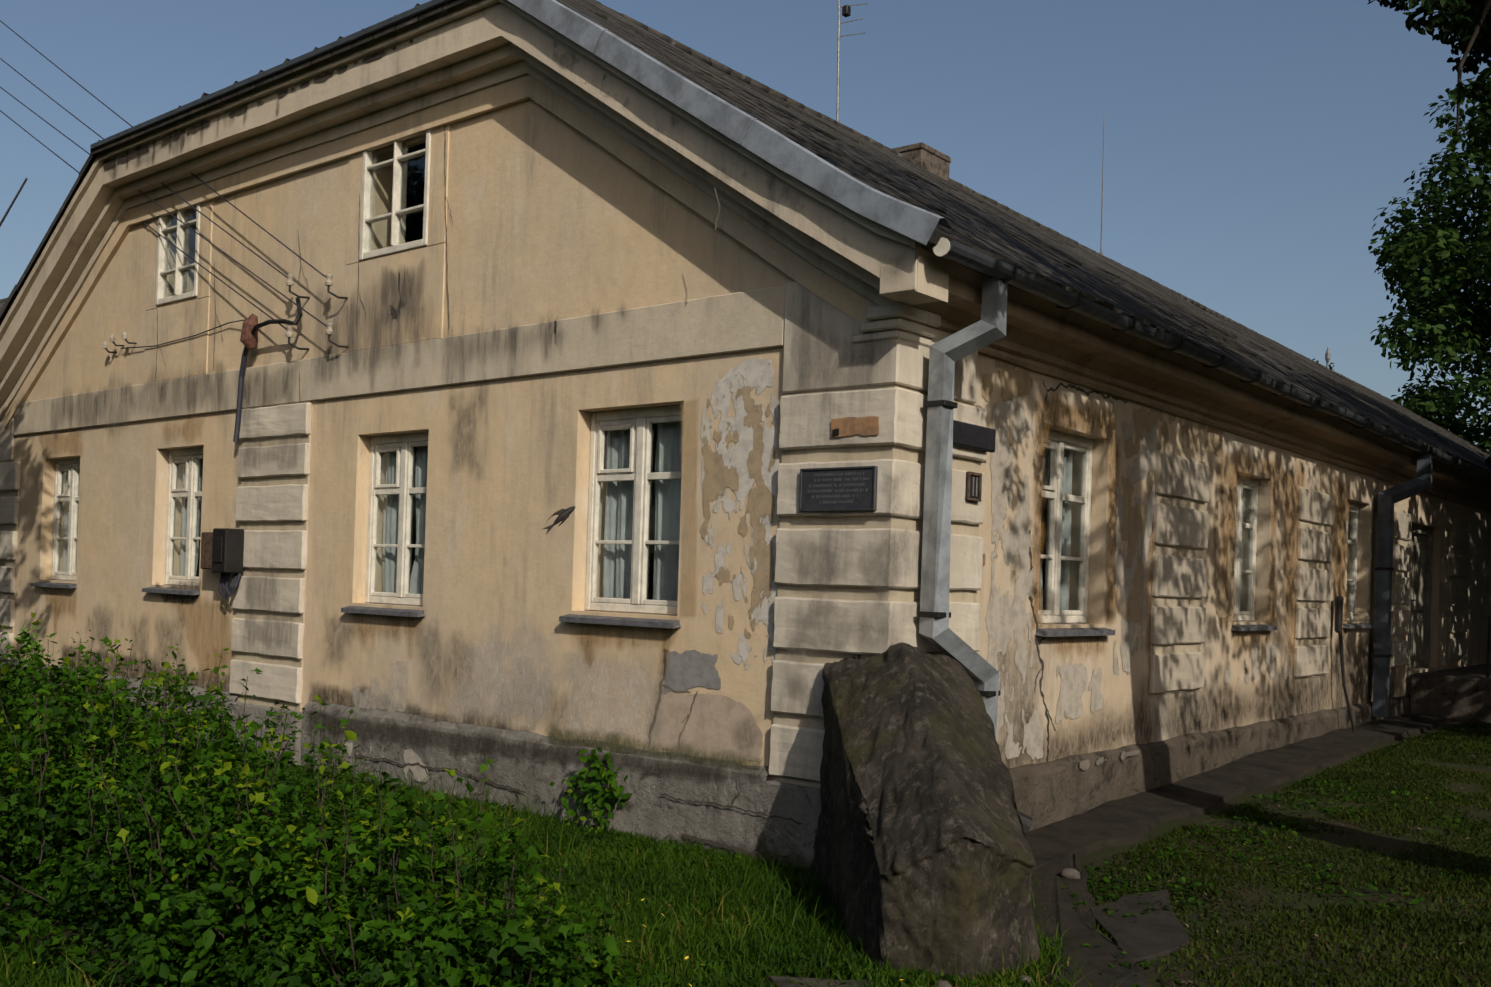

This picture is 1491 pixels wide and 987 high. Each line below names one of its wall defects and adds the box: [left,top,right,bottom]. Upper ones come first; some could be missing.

peeling [700,358,779,680]
crack [1029,530,1056,760]
peeling [982,359,1224,760]
water stain [1000,636,1397,769]
peeling [1214,482,1234,619]